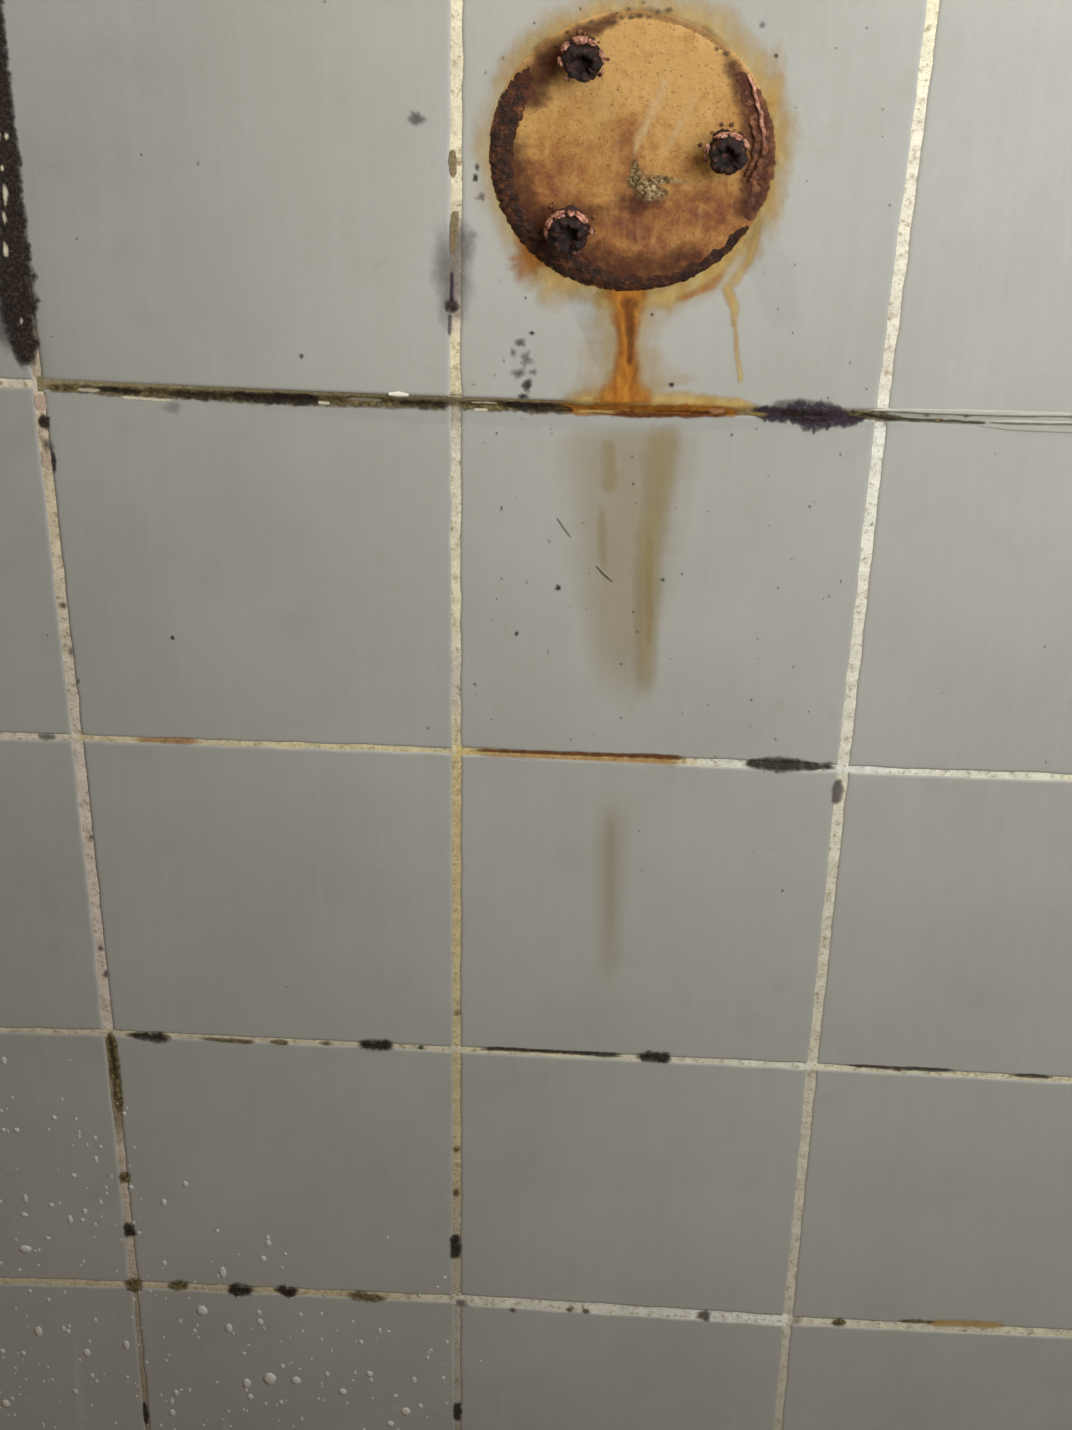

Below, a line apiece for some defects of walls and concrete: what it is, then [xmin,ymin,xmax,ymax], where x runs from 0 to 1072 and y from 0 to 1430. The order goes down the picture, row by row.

leakage [0,0,40,365]
corrosion [497,0,783,418]
leakage [50,331,573,414]
leakage [753,400,917,434]
corrosion [480,749,681,760]
leakage [746,758,843,803]
leakage [484,1047,618,1057]
leakage [639,1051,671,1063]
leakage [450,1235,461,1258]
leakage [229,1283,252,1297]
leakage [276,1286,298,1297]
leakage [454,1403,462,1420]